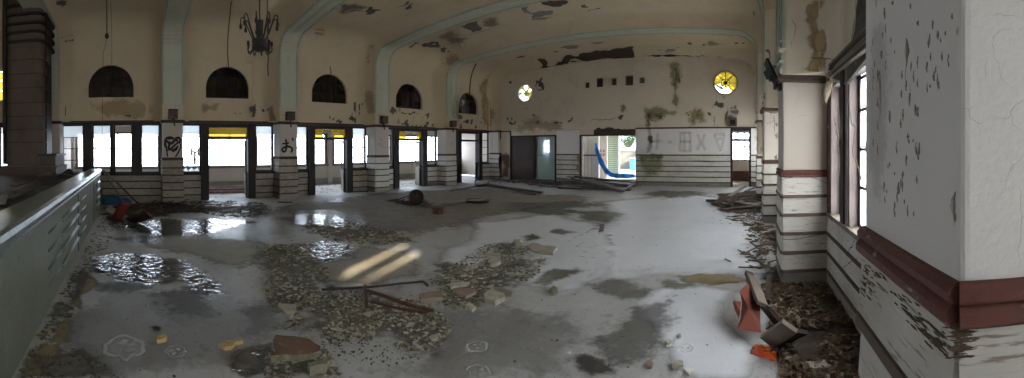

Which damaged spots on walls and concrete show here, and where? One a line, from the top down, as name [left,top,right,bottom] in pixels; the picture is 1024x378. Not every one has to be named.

peeling [830,0,958,217]
peeling [860,264,980,359]